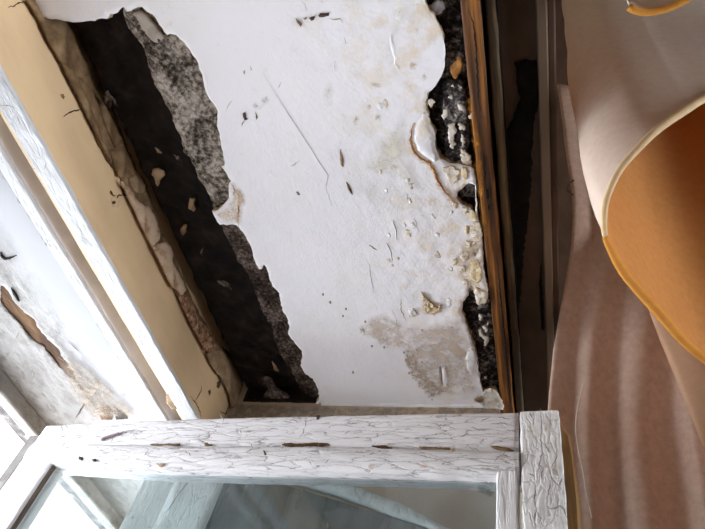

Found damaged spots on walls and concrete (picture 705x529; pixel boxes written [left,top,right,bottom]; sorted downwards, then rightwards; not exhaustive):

peeling [1,286,113,420]
flaking render [25,0,319,408]
flaking render [409,0,504,409]
crack [528,410,567,527]